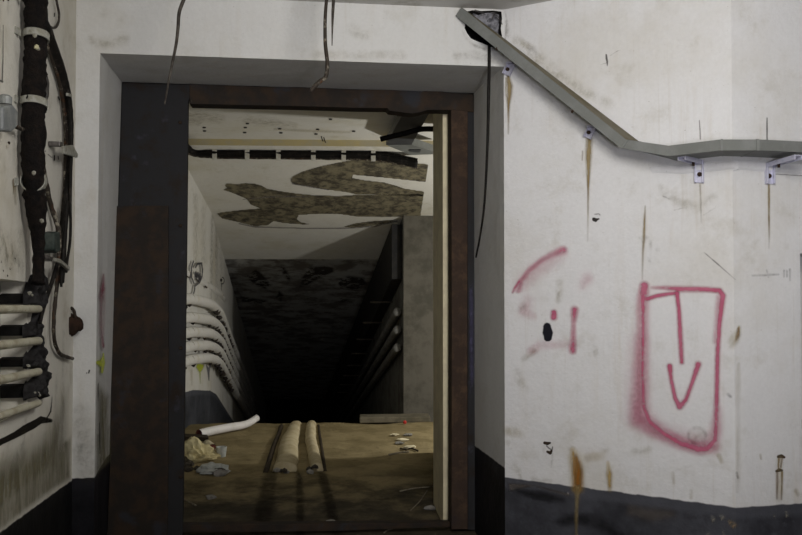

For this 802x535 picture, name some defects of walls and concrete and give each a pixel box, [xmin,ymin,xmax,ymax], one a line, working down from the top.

spalling [465,24,494,47]
spalling [468,10,503,36]
peeling [217,160,428,228]
rust [571,450,582,501]
rust [775,454,785,496]